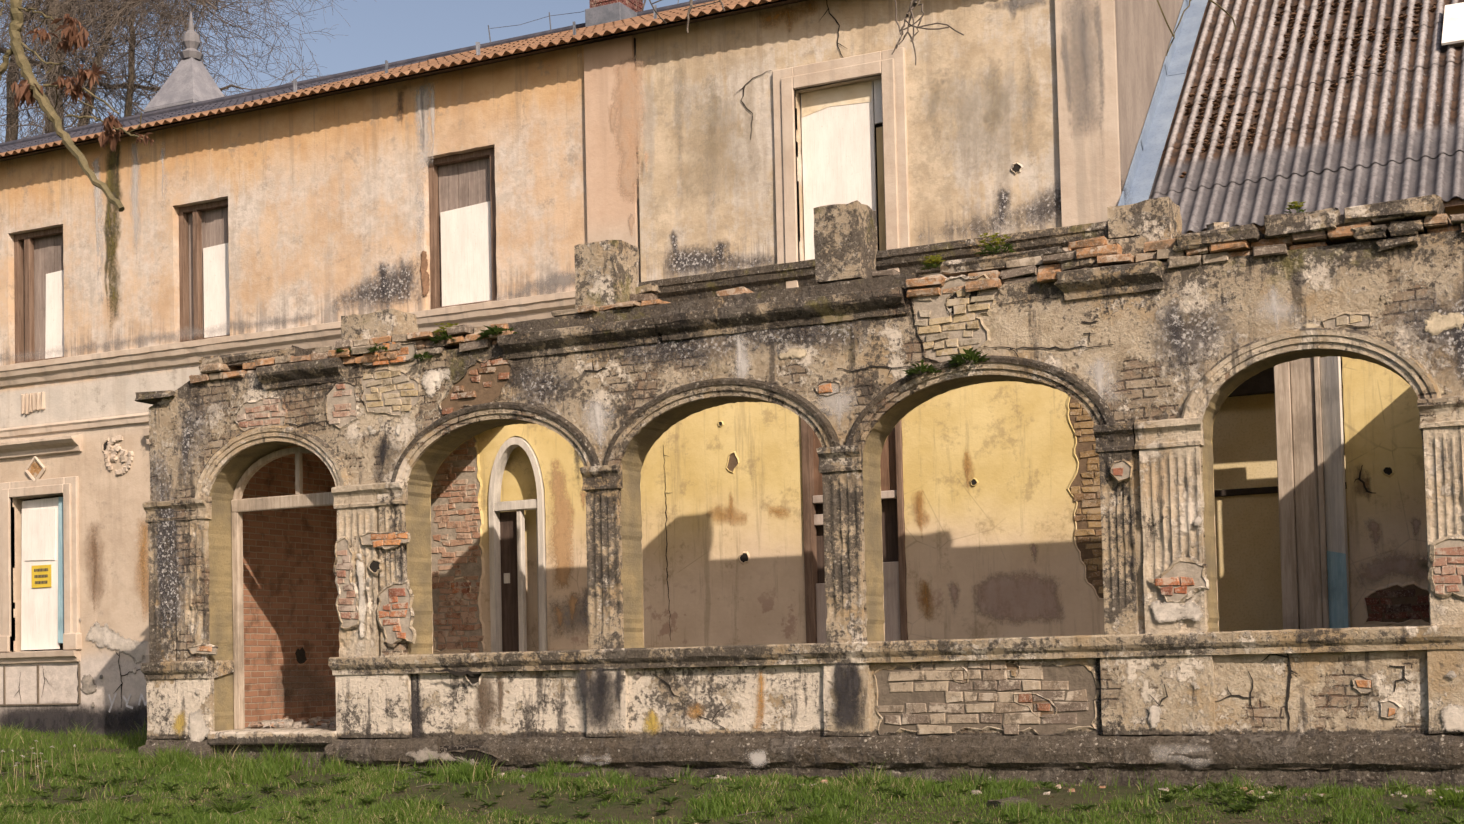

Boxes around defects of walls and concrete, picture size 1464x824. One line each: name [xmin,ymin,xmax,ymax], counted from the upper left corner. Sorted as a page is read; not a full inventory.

crack [819,0,848,58]
crack [739,70,772,140]
damp [94,144,139,313]
flaking render [323,341,515,654]
flaking render [1065,396,1133,602]
flaking render [949,574,1063,622]
flaking render [1360,519,1464,626]
damp [579,667,623,729]
damp [833,662,861,730]
crack [1214,654,1297,731]